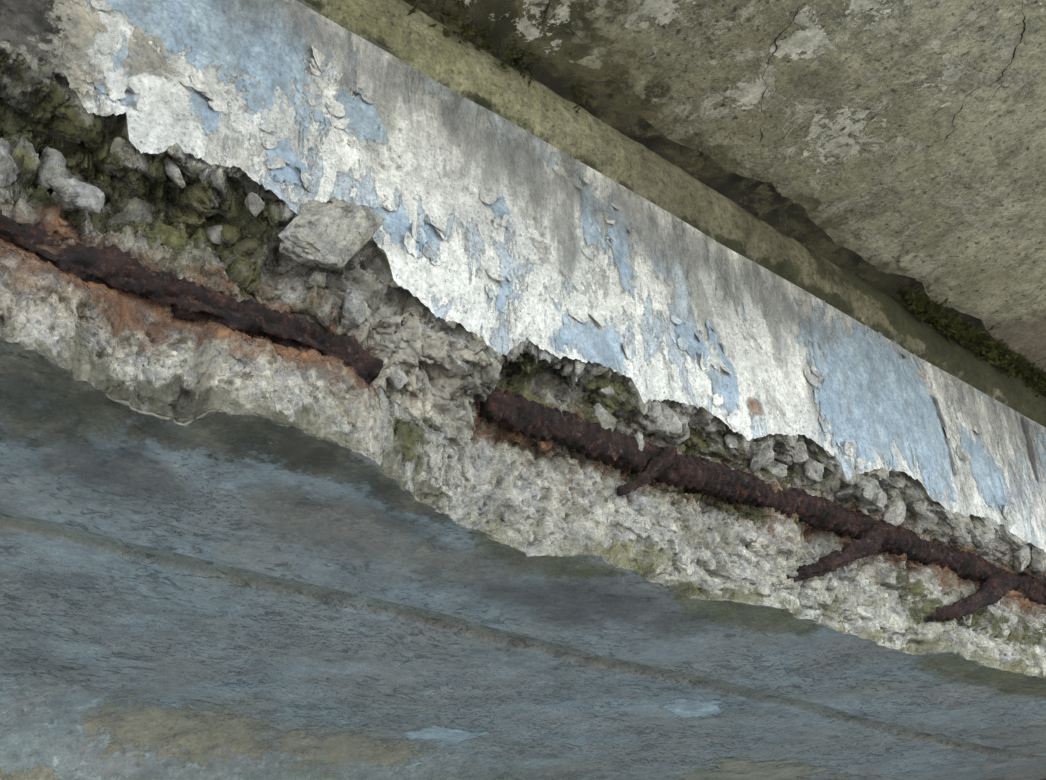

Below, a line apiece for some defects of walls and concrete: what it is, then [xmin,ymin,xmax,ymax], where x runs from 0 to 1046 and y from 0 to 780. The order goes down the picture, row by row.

crack [542,0,581,40]
crack [944,0,1026,143]
rust [0,202,381,401]
spalling [0,0,1046,586]
spalling [0,250,1046,678]
rust [472,402,580,470]
rust [748,398,763,416]
rust [643,479,822,550]
rust [859,551,982,595]
rust [1000,589,1046,617]
peeling [398,726,489,742]
peeling [658,698,722,718]